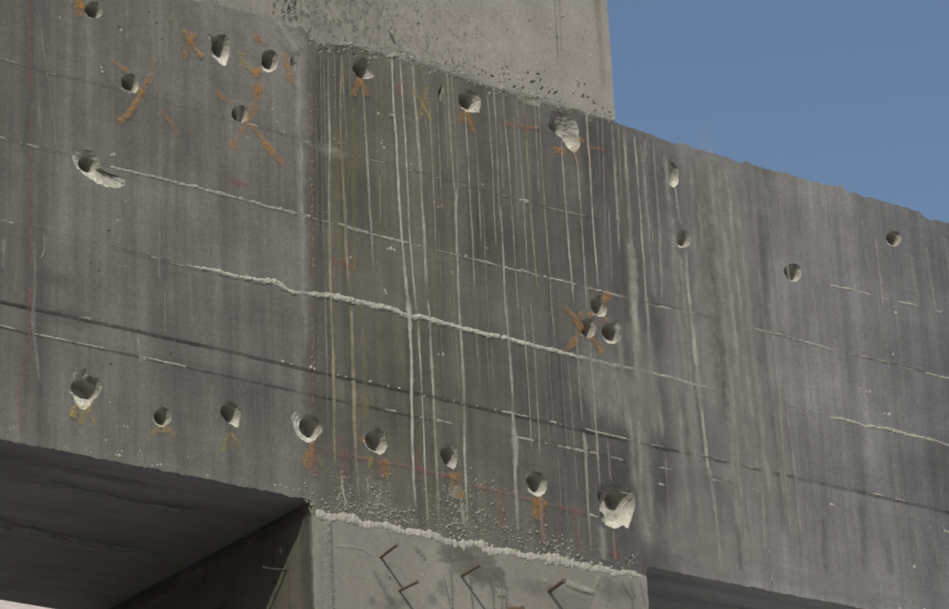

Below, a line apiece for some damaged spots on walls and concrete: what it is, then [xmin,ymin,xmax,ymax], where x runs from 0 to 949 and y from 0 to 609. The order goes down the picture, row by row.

spalling [69,369,103,409]
spalling [72,149,125,188]
water stain [278,22,347,459]
water stain [364,110,381,251]
water stain [390,61,481,514]
water stain [490,91,541,393]
water stain [523,310,540,453]
spalling [547,110,580,152]
water stain [561,112,807,571]
water stain [511,413,519,518]
spalling [598,483,635,529]